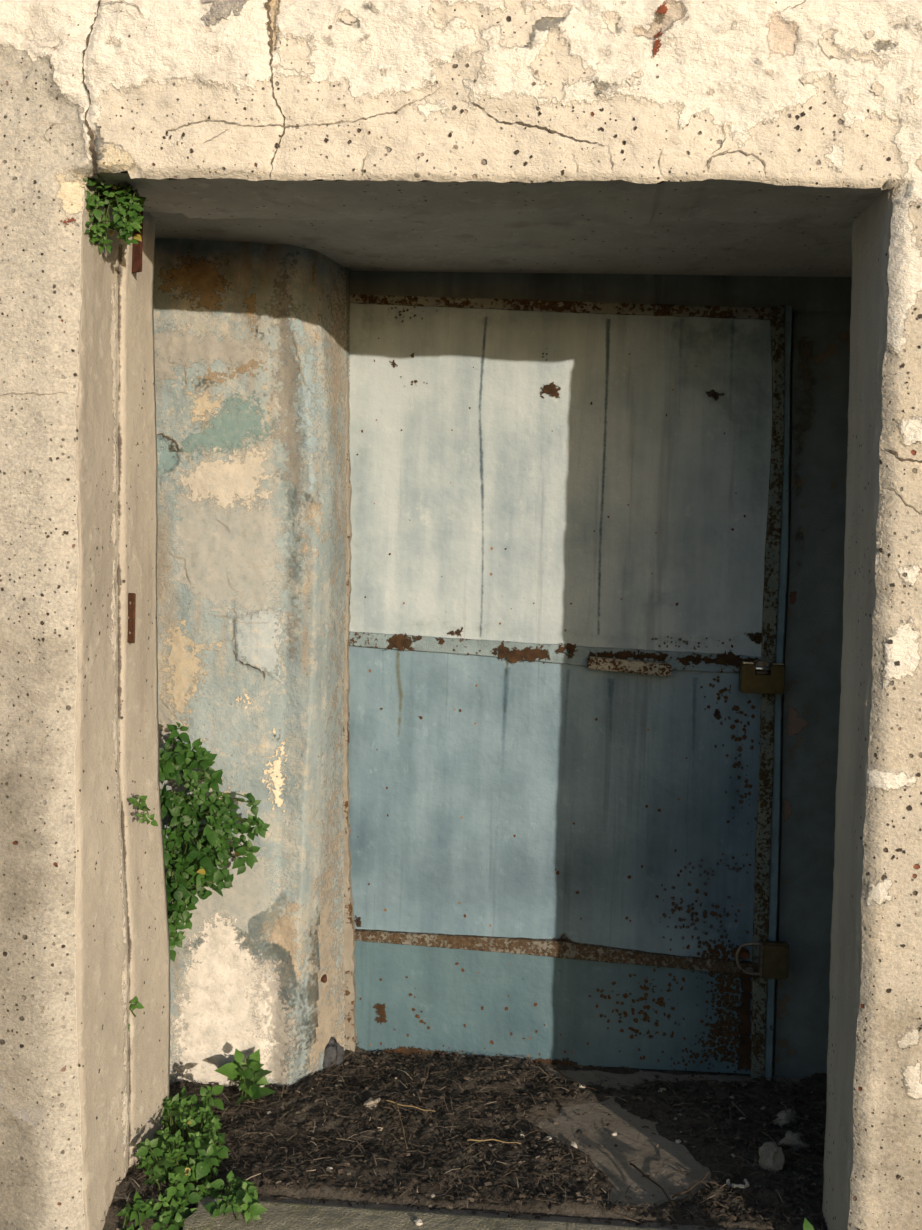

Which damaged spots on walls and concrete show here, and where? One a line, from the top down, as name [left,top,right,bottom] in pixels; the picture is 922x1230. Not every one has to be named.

crack [44,0,145,173]
crack [167,0,443,178]
peeling [96,0,909,197]
crack [469,101,615,174]
peeling [908,198,922,257]
rust [540,382,561,398]
crack [883,448,922,514]
peeling [0,44,99,1230]
spalling [154,252,351,1087]
rust [385,627,762,832]
peeling [848,290,922,1230]